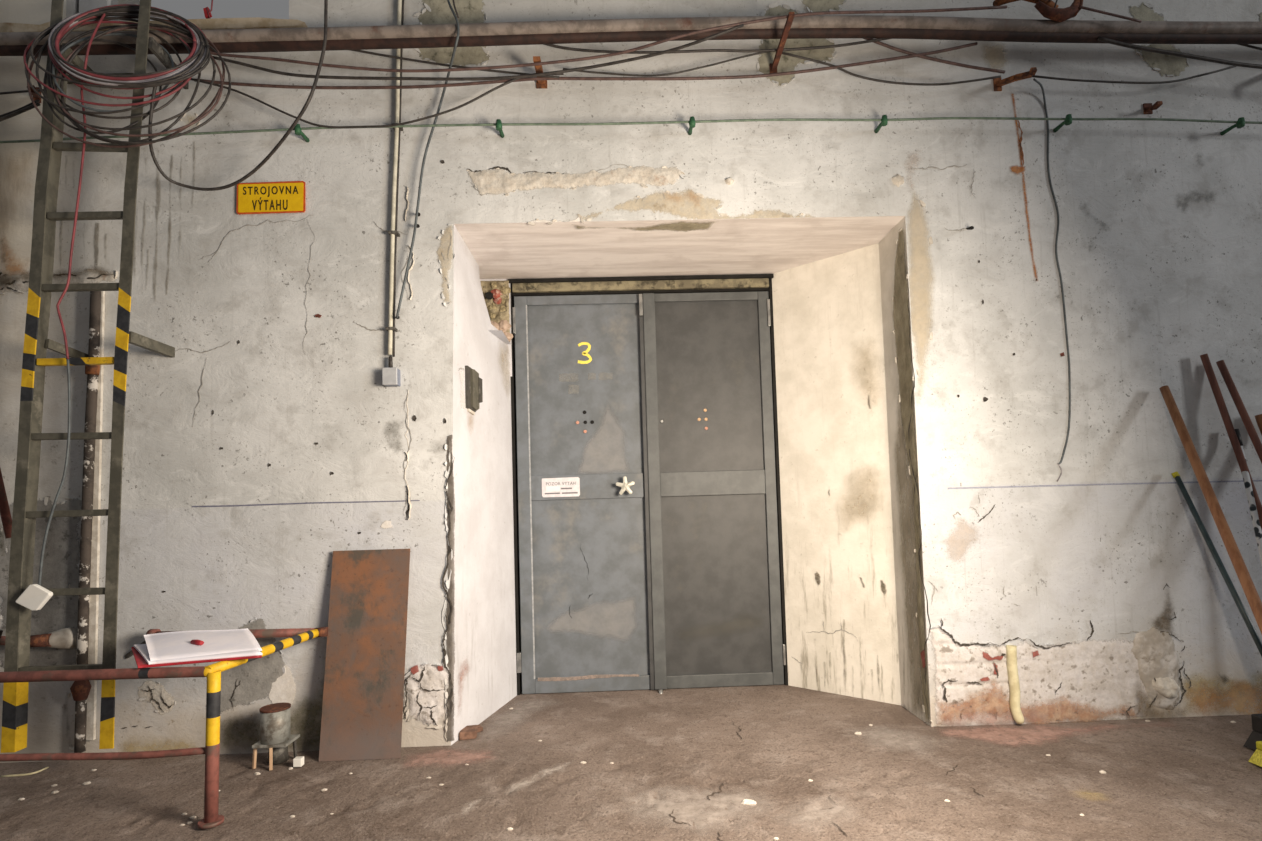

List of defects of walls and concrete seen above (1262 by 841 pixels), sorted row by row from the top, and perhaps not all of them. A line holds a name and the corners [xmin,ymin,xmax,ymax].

peeling [413,0,486,25]
peeling [413,46,489,68]
peeling [756,39,837,86]
flaking render [467,164,810,231]
crack [202,215,315,355]
crack [403,390,412,520]
flaking render [892,200,1148,726]
flaking render [403,418,483,741]
crack [441,436,454,742]